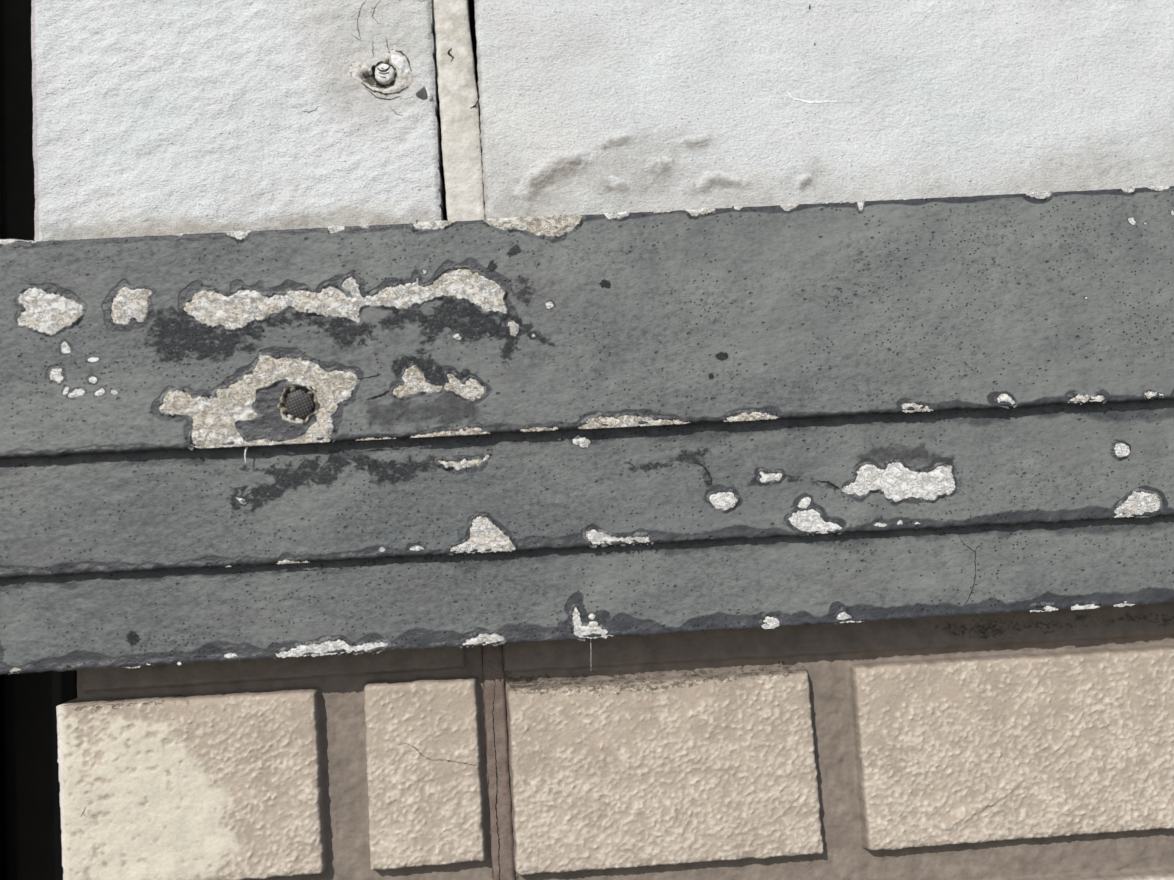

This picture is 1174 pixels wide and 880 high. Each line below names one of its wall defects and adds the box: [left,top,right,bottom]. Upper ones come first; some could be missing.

peeling [108,284,154,328]
peeling [181,265,537,339]
peeling [16,285,119,399]
peeling [157,352,360,450]
peeling [389,363,487,404]
peeling [723,409,778,422]
peeling [839,459,958,505]
peeling [1110,488,1163,519]
peeling [447,513,518,555]
peeling [273,636,391,660]
peeling [459,630,506,649]
peeling [569,604,617,641]